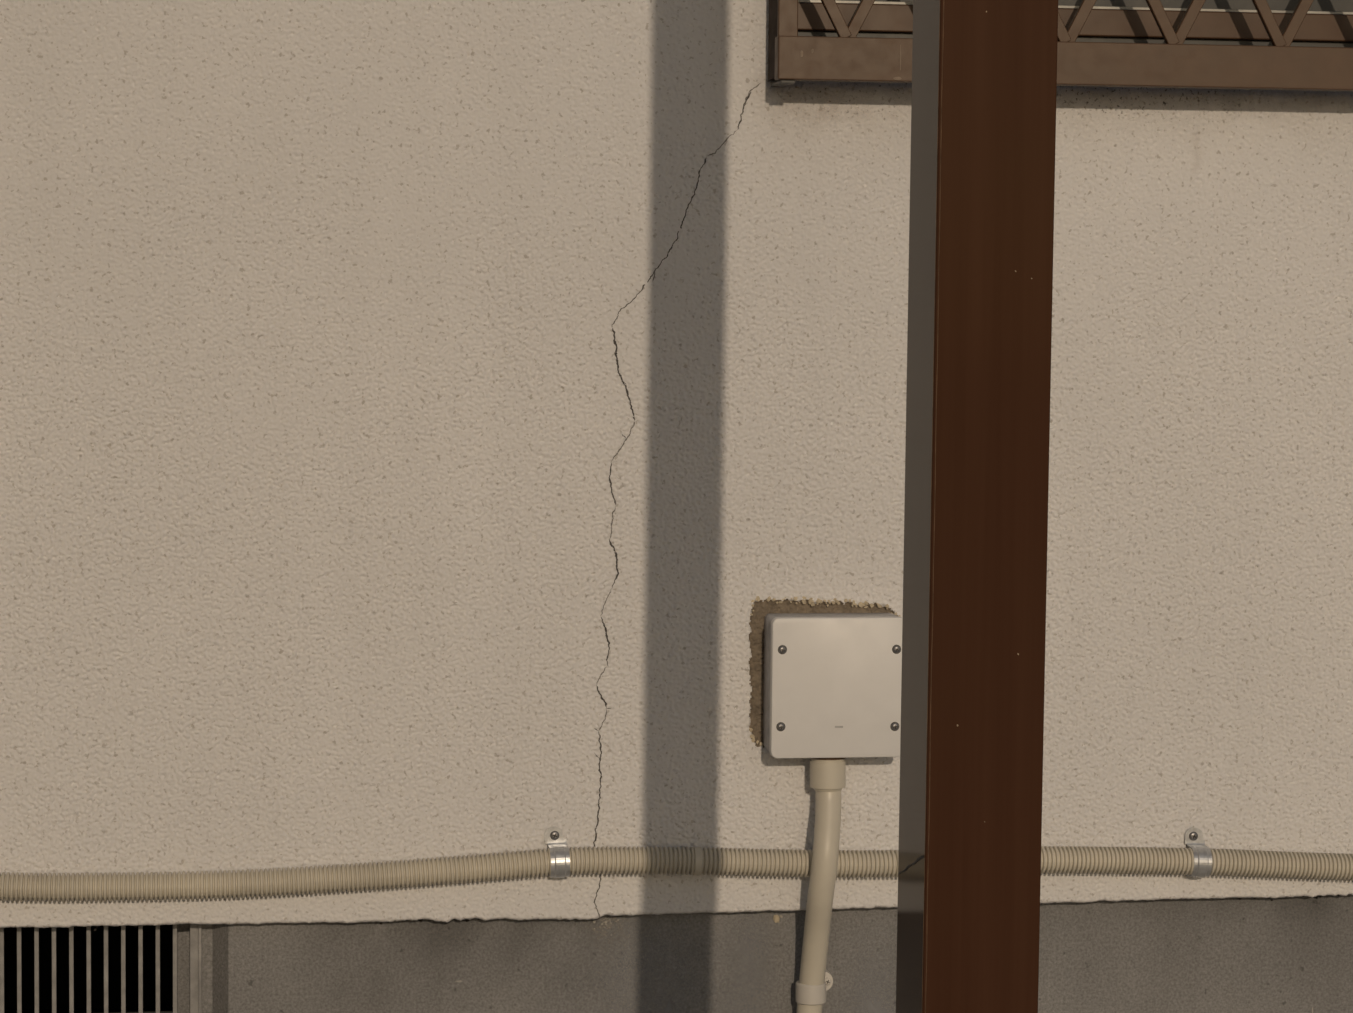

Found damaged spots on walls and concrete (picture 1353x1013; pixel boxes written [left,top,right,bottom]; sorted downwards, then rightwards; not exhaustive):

crack [593,83,760,917]